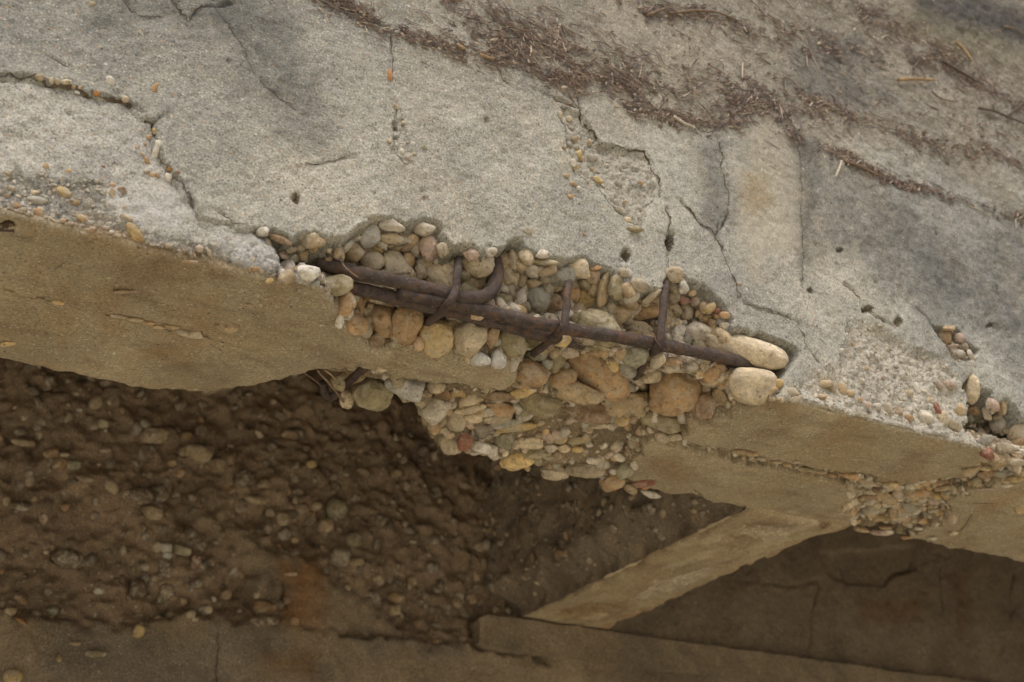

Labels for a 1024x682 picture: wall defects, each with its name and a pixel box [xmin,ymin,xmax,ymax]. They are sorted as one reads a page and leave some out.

crack [0,57,249,226]
crack [548,61,818,362]
peeling [0,80,1024,540]
spalling [3,669,24,682]
spalling [0,588,110,625]
spalling [43,374,451,638]
spalling [366,503,513,644]